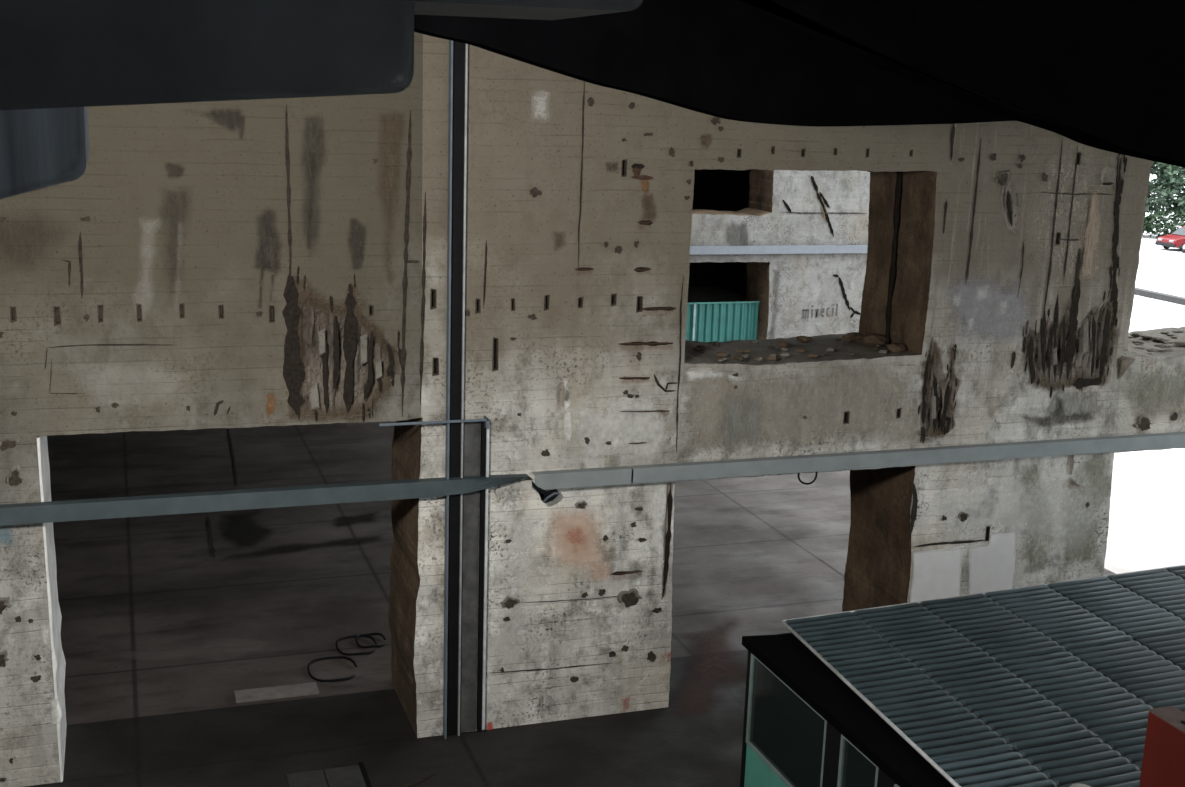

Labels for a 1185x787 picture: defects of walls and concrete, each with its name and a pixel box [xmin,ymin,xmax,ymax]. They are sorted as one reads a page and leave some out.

leakage [257,211,279,299]
spalling [282,265,401,422]
spalling [918,336,962,443]
spalling [1022,154,1136,398]